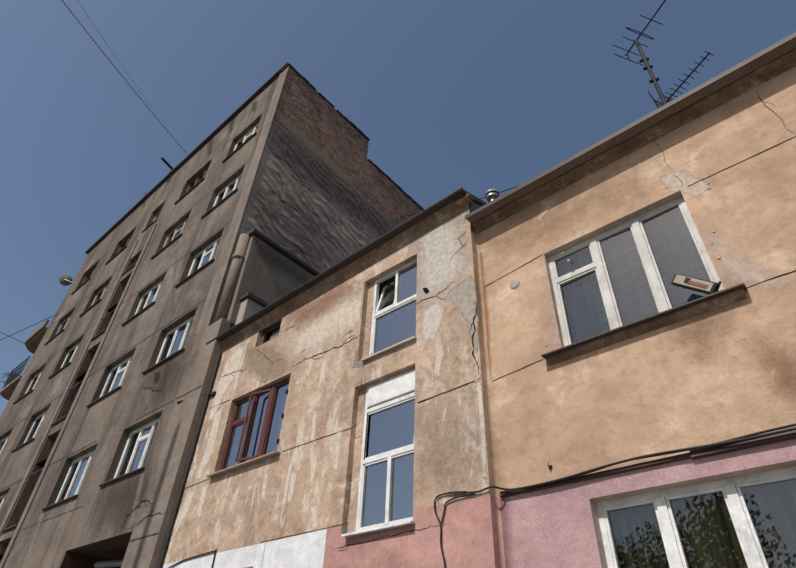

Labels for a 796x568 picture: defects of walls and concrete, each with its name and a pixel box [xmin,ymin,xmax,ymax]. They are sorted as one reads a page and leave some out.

crack [245,144,363,268]
peeling [660,170,712,196]
peeling [417,220,478,352]
crack [257,330,369,373]
crack [470,301,481,375]